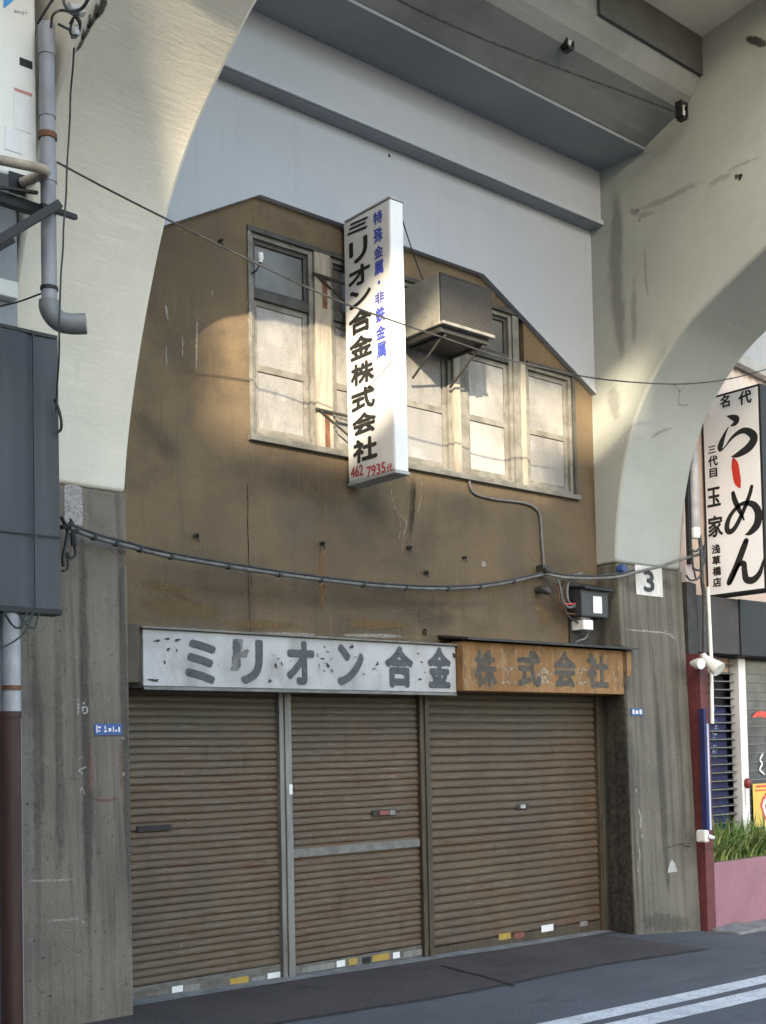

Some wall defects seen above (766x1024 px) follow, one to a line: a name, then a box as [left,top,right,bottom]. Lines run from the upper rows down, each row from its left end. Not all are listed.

crack [245,485,253,632]
crack [389,481,423,552]
damp [81,567,92,903]